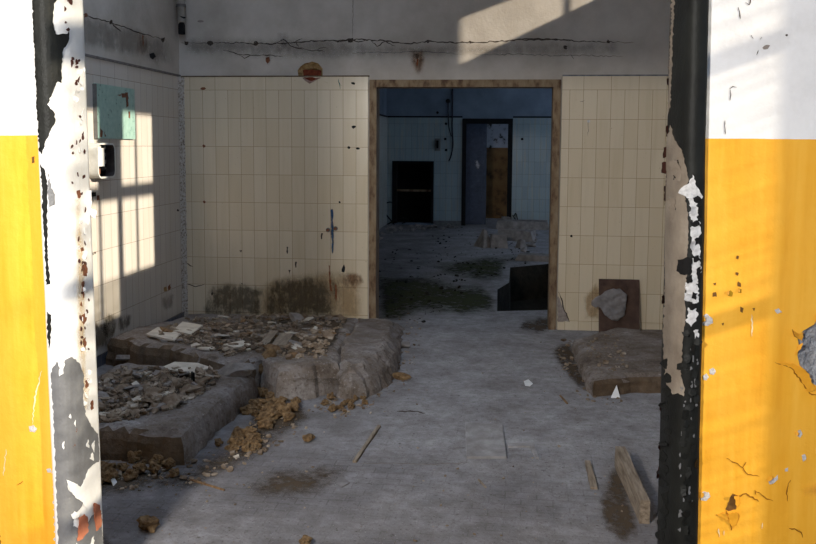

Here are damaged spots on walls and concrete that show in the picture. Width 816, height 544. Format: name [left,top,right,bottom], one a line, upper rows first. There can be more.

crack [83,14,160,39]
flaking render [298,62,323,84]
crack [181,5,633,59]
rust [413,52,423,71]
peeling [667,0,675,113]
peeling [32,0,87,285]
peeling [71,172,97,351]
mould [206,279,330,314]
peeling [655,125,724,541]
flaking render [775,321,816,395]
peeling [47,357,103,544]
crack [727,458,791,500]